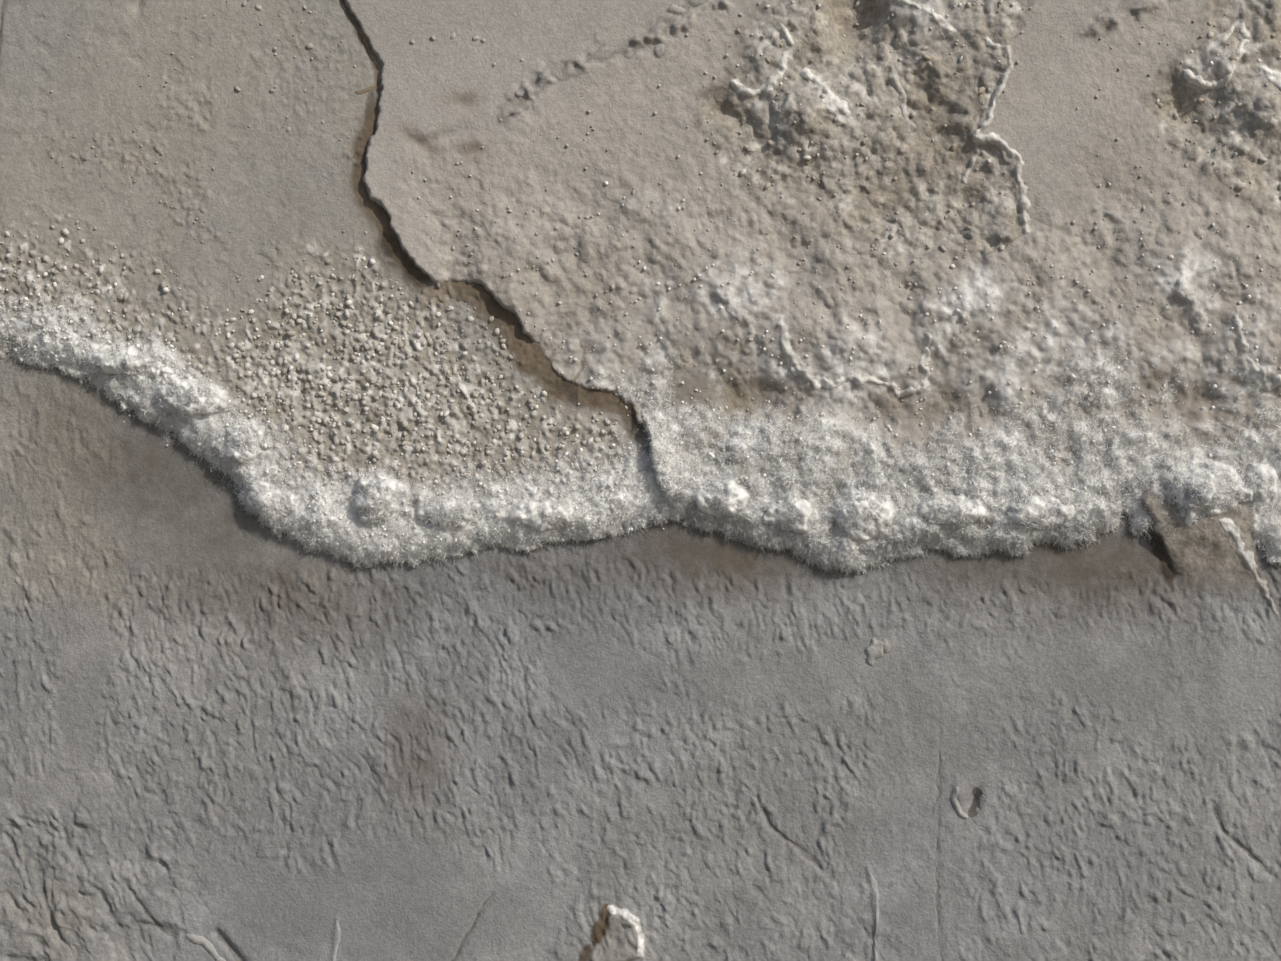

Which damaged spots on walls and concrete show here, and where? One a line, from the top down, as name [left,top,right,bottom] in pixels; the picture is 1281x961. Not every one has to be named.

crack [341,0,650,468]
peeling [0,0,1281,572]
water stain [0,223,1281,585]
peeling [1111,484,1281,615]
spalling [580,904,644,961]